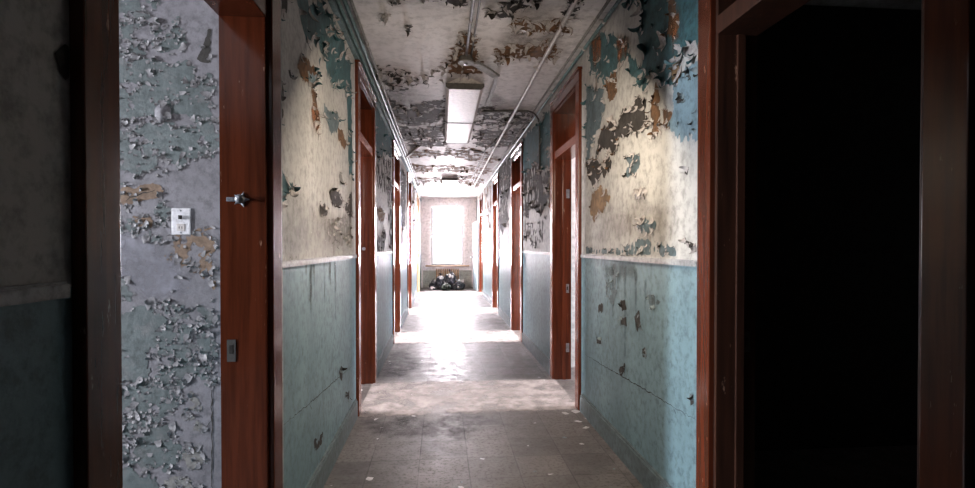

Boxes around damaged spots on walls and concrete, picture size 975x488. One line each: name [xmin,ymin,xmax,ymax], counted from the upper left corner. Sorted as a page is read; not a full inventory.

peeling [119,0,221,488]
peeling [281,0,357,250]
peeling [371,0,585,252]
peeling [581,0,698,222]